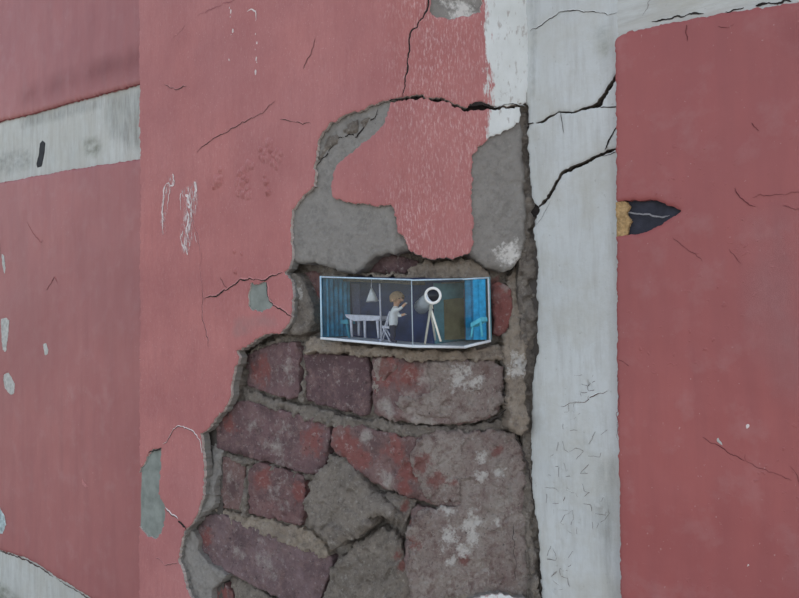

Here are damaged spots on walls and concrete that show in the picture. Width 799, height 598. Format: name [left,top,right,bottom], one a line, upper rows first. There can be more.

peeling [427,0,482,20]
crack [646,0,704,40]
crack [718,0,791,28]
crack [316,0,533,166]
crack [552,83,616,133]
crack [531,128,616,220]
leakage [180,182,197,255]
peeling [615,200,681,236]
peeling [1,318,9,352]
flaking render [184,100,542,598]
peeling [3,371,15,395]
peeling [141,449,165,539]